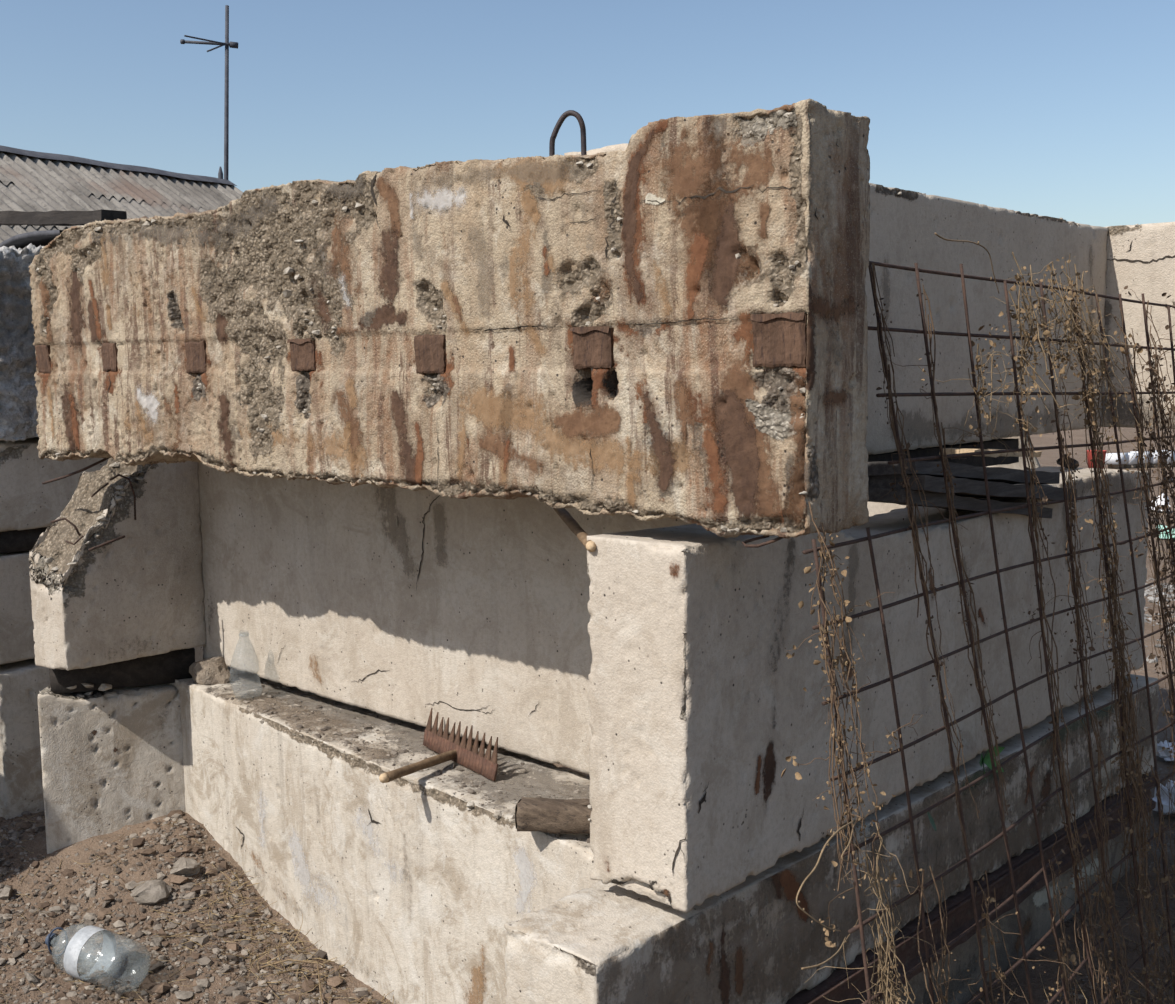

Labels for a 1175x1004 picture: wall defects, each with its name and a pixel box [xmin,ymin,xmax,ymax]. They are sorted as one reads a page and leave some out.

corrosion [66,238,112,357]
corrosion [594,119,784,337]
spalling [732,108,808,307]
crack [1107,242,1175,263]
corrosion [36,357,81,452]
corrosion [164,358,255,472]
spalling [28,157,671,608]
corrosion [440,280,855,525]
crack [397,434,440,589]
crack [425,701,492,714]
spalling [679,628,687,720]
spalling [686,261,1175,1004]